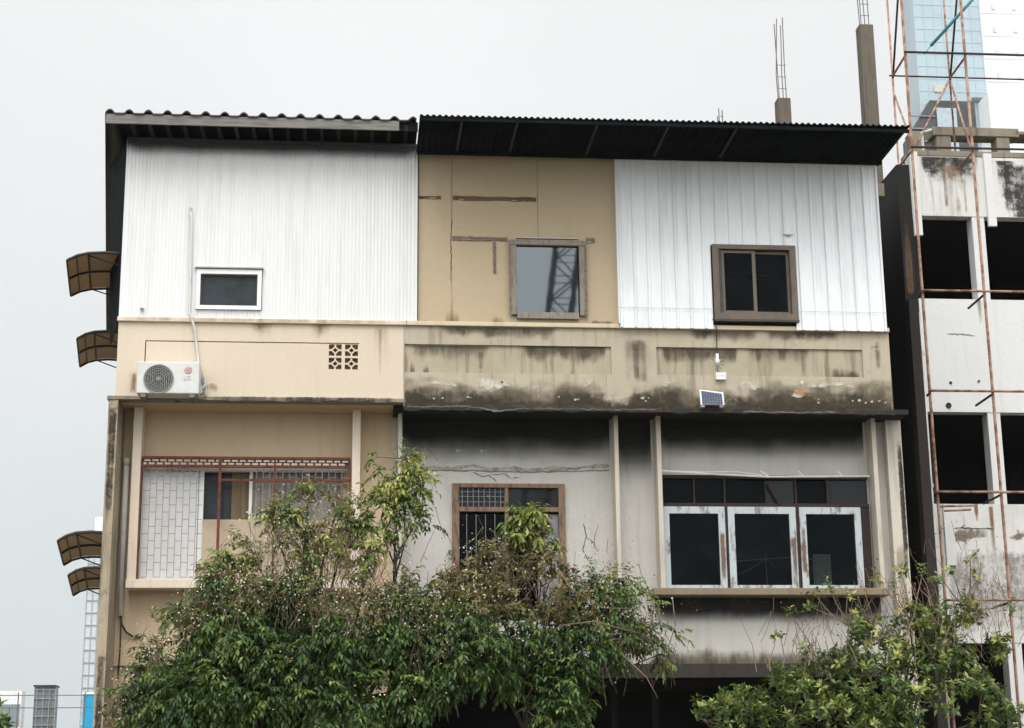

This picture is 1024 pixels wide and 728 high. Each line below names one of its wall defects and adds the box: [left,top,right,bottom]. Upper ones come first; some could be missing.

water stain [921,157,972,175]
water stain [996,161,1024,217]
water stain [418,327,605,357]
water stain [664,331,754,360]
water stain [753,332,835,357]
water stain [403,372,894,461]
water stain [106,413,116,509]